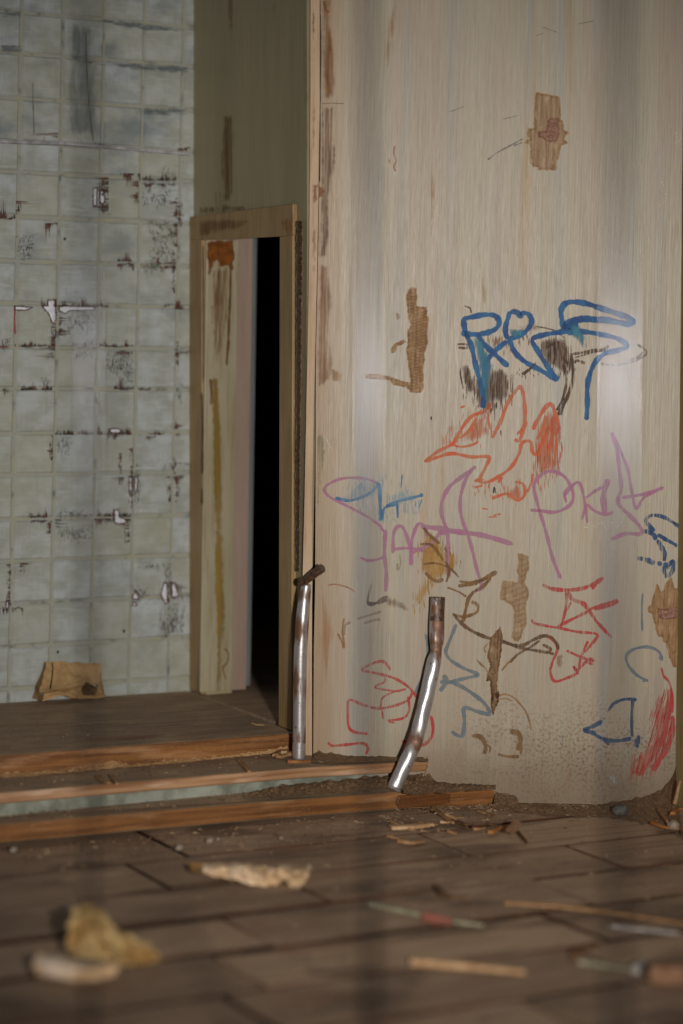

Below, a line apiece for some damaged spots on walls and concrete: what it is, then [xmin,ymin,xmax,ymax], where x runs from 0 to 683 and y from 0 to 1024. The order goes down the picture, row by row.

spalling [92,177,109,214]
spalling [3,297,151,390]
rust [205,222,235,366]
spalling [374,287,429,393]
spalling [47,426,132,461]
spalling [25,448,143,544]
spalling [131,562,188,639]
spalling [477,553,532,730]